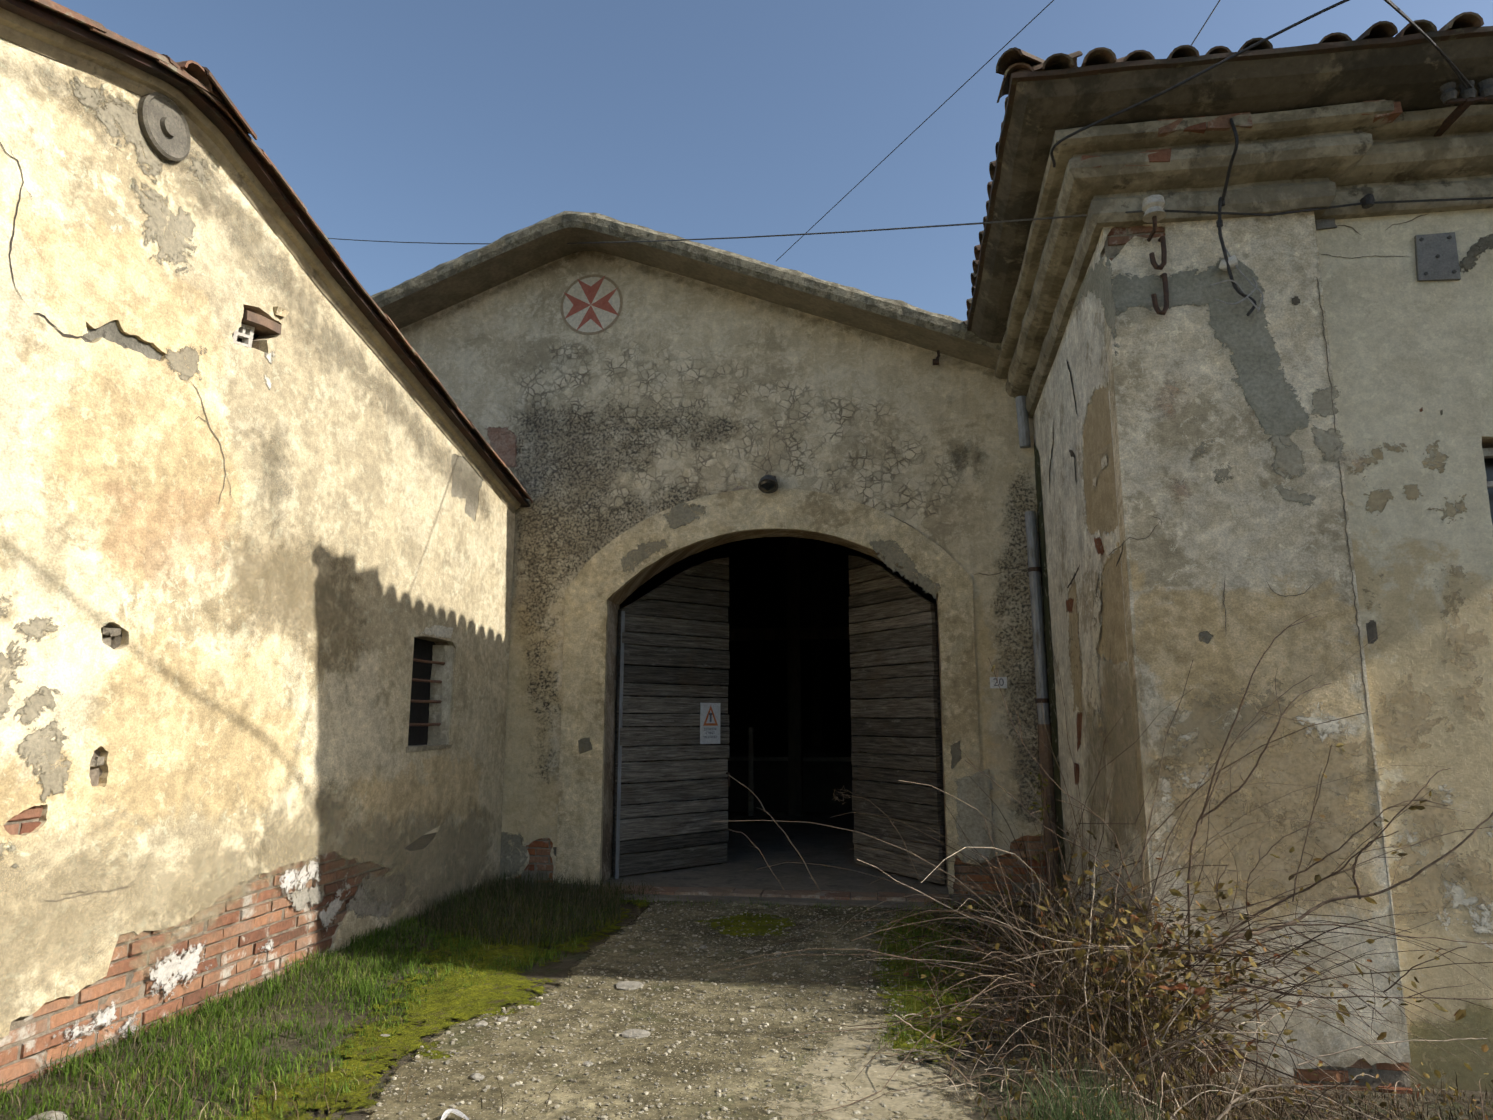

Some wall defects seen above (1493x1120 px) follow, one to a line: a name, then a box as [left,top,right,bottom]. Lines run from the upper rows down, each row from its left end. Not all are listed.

crack [0,142,92,342]
crack [190,381,232,504]
peeling [1192,440,1233,485]
crack [1317,213,1429,717]
peeling [0,595,105,868]
spalling [101,623,122,649]
damp [510,400,740,783]
peeling [950,740,1047,896]
spalling [0,851,407,1093]